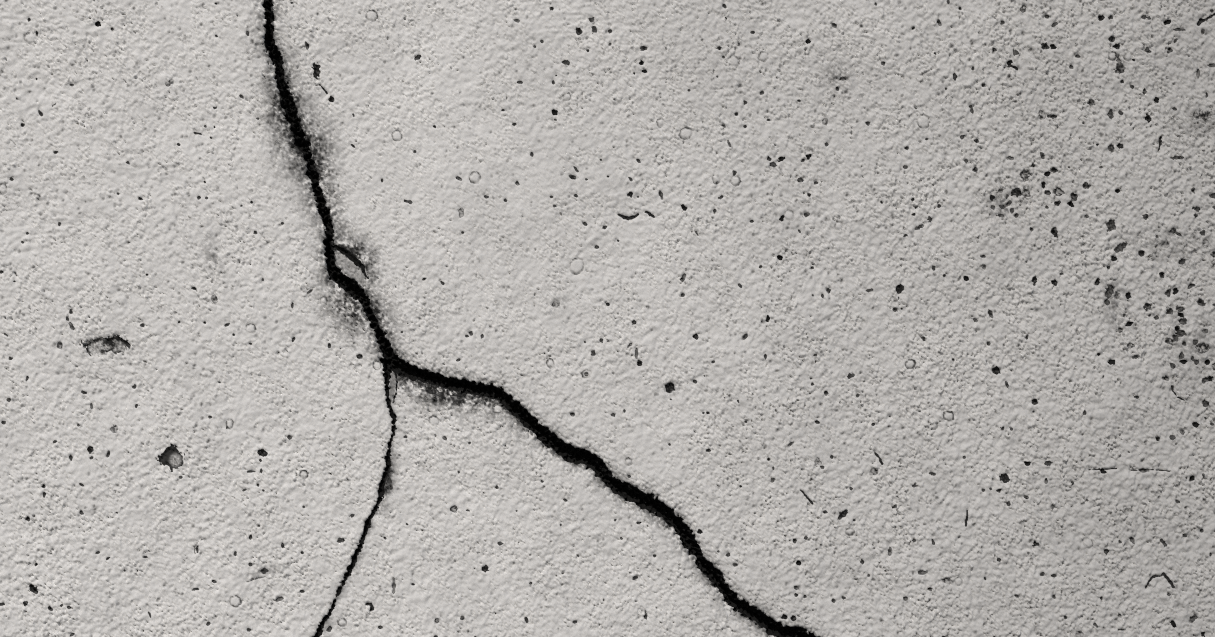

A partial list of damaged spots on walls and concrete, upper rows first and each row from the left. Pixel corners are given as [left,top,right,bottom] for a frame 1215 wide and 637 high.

crack [262,0,819,637]